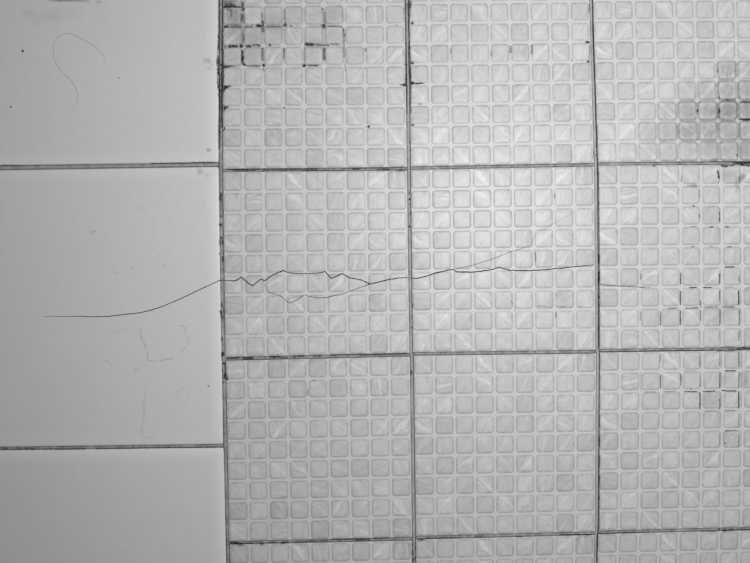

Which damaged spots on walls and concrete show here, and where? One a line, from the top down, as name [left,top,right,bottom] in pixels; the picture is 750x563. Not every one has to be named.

crack [44,245,589,317]